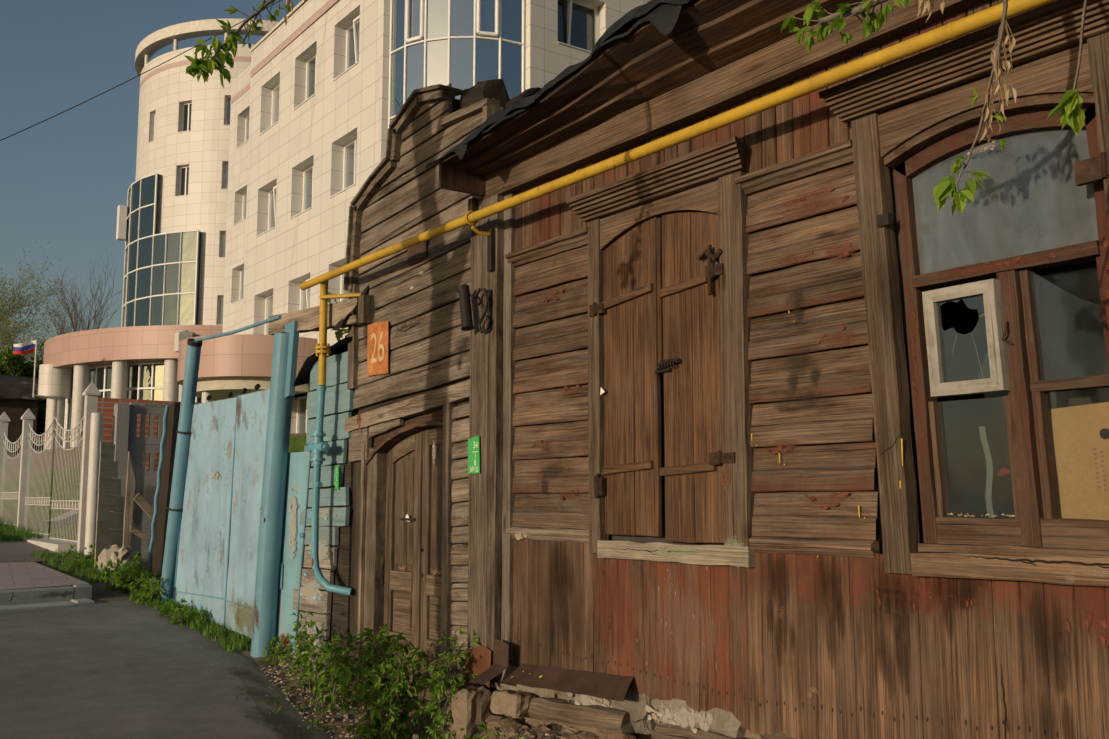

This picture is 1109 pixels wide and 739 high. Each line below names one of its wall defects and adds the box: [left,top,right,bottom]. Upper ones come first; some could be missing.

peeling [289,488,336,563]
crack [969,555,1109,568]
spalling [646,705,698,733]